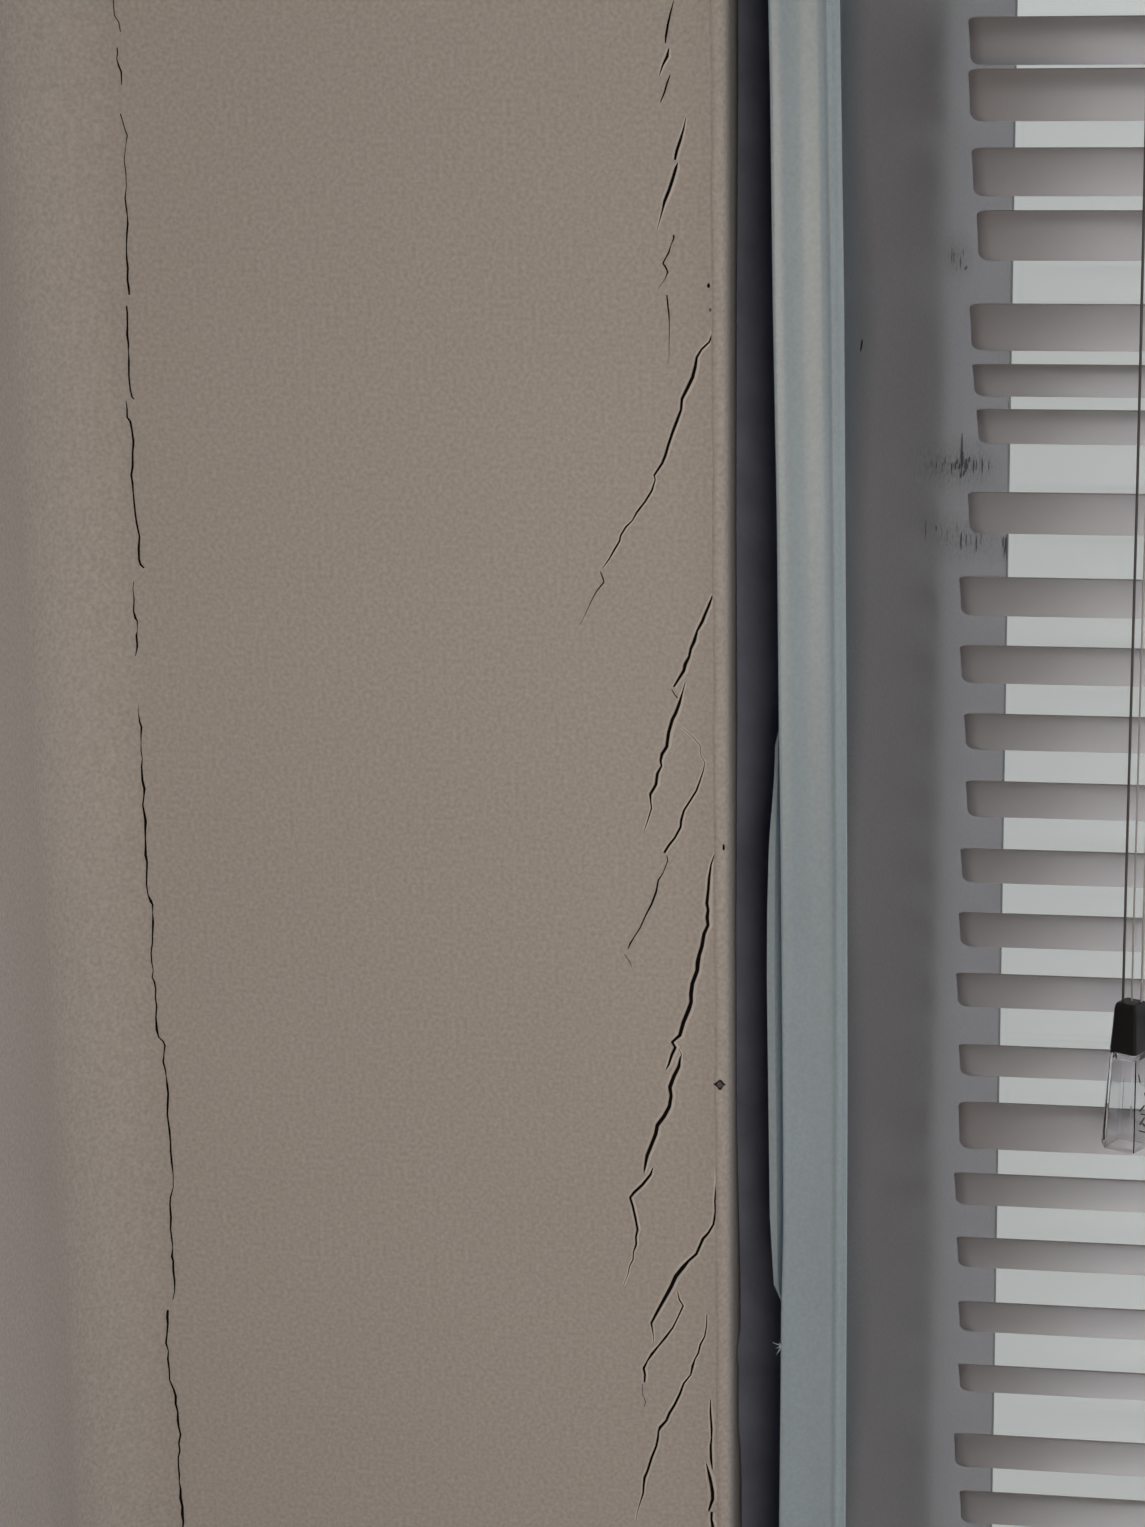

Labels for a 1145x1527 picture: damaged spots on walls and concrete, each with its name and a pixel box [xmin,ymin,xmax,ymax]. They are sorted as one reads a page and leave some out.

crack [113,0,145,656]
crack [580,0,712,624]
crack [138,706,184,1527]
crack [624,593,713,967]
crack [622,852,715,1286]
crack [635,1173,717,1527]